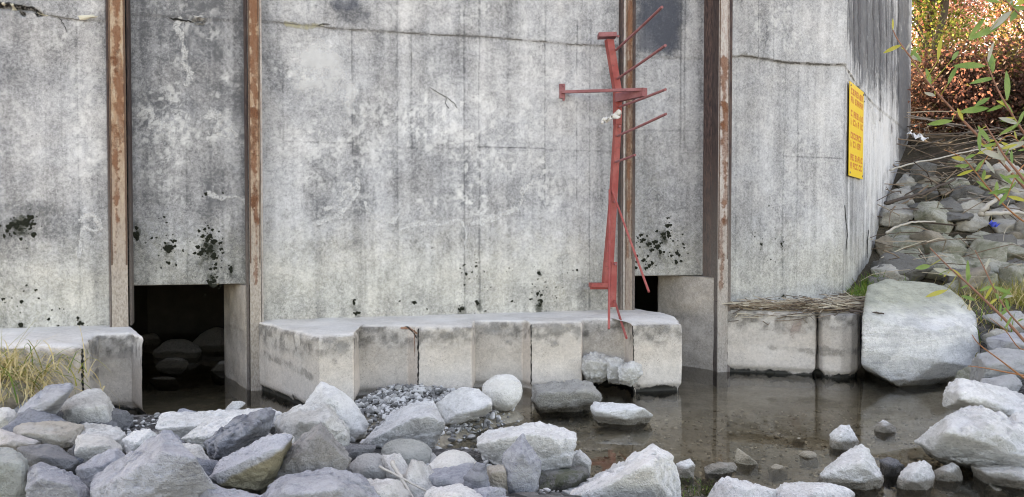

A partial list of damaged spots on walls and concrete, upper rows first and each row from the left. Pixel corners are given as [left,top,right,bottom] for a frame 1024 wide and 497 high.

corrosion [108,0,128,265]
corrosion [248,0,260,284]
corrosion [718,0,729,288]